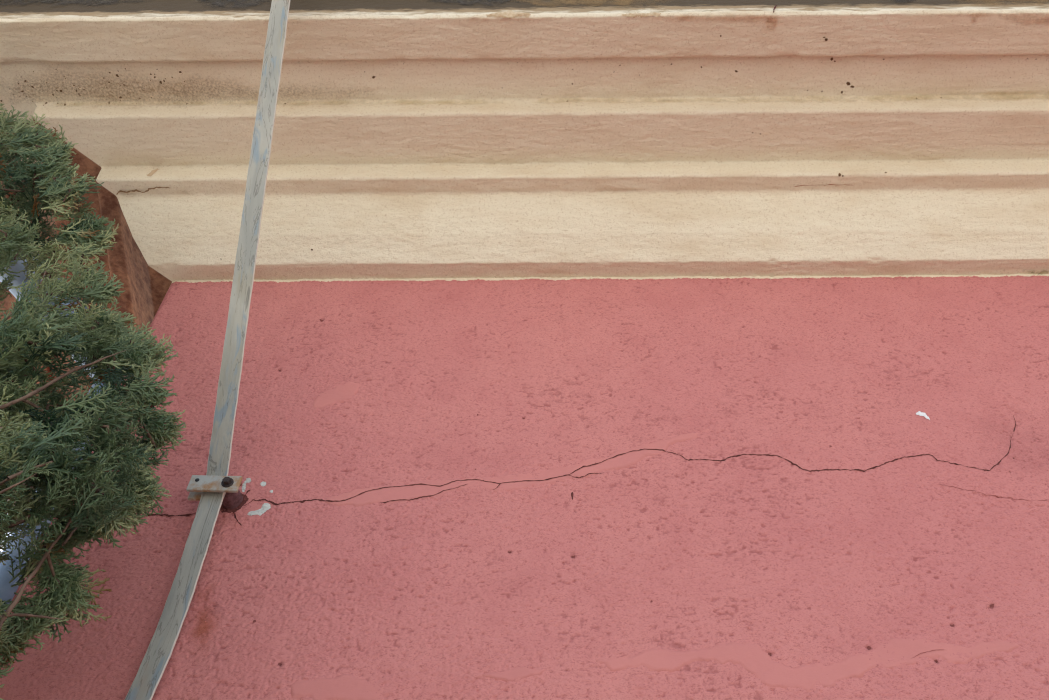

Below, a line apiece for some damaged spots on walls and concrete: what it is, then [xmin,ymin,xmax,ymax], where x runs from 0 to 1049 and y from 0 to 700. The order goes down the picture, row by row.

crack [234,415,1045,526]